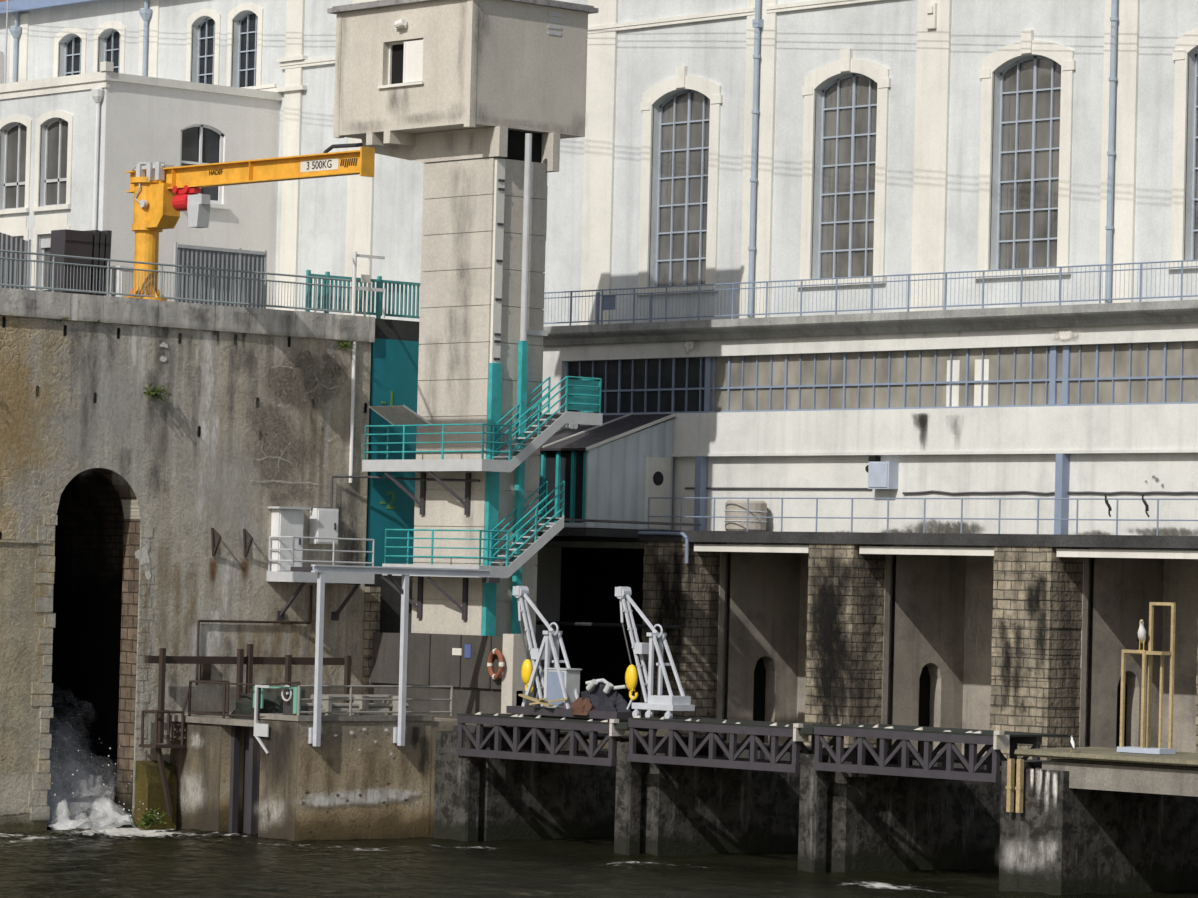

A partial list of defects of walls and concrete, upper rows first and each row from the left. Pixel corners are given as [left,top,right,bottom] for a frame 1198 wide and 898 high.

crack [250,444,321,485]
water stain [914,413,927,444]
water stain [810,560,853,724]
water stain [999,619,1020,703]
water stain [1027,575,1045,656]